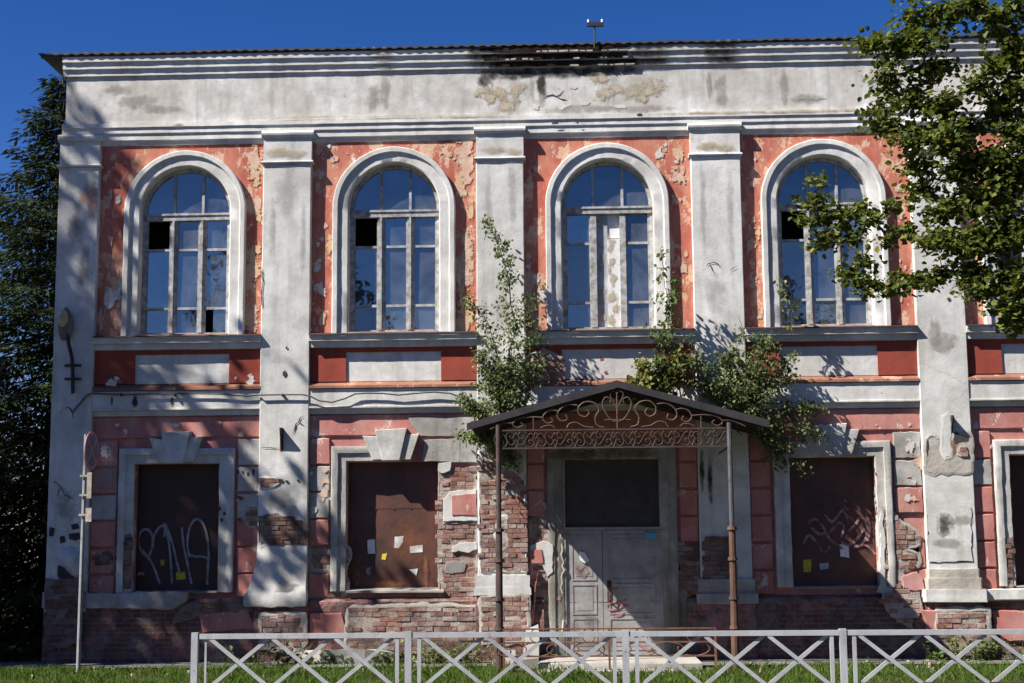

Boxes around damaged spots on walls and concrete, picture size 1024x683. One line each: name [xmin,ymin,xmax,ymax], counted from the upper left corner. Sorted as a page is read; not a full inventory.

flaking render [474,80,539,112]
damp [468,45,666,100]
flaking render [552,72,666,124]
peeling [245,143,264,225]
peeling [655,139,685,205]
peeling [104,269,122,332]
peeling [244,240,261,334]
peeling [314,222,332,297]
peeling [439,139,474,331]
flaking render [939,412,968,460]
flaking render [235,445,567,661]
flaking render [879,504,993,655]